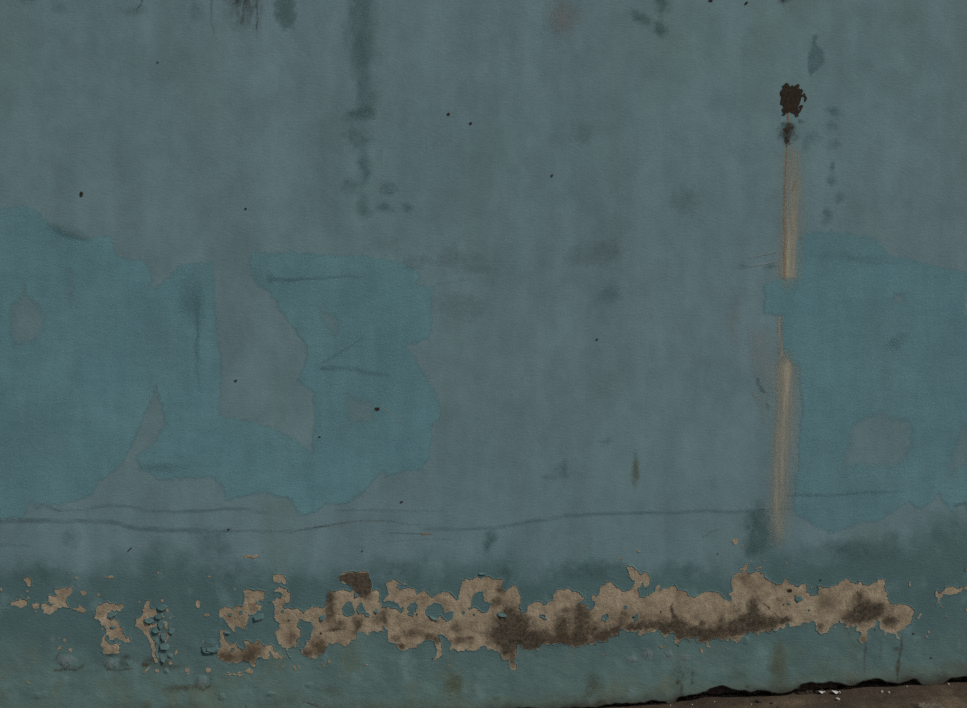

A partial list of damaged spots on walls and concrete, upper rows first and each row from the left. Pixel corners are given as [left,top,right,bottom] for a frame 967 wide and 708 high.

corrosion [783,144,798,279]
peeling [9,572,178,673]
peeling [195,558,922,676]
peeling [934,584,967,617]